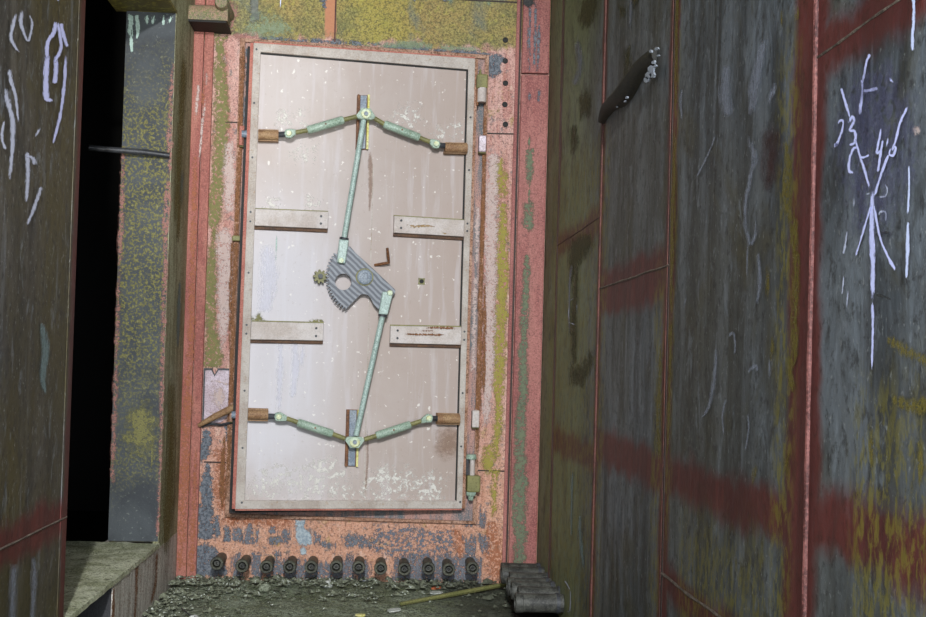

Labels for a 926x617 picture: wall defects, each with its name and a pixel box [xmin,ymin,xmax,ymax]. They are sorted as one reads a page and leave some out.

corrosion [475,119,487,411]
peeling [196,426,503,584]